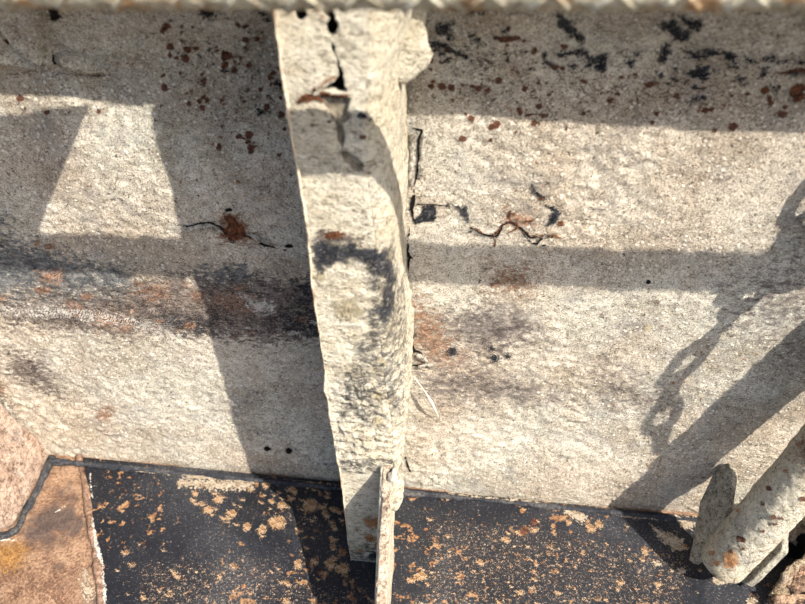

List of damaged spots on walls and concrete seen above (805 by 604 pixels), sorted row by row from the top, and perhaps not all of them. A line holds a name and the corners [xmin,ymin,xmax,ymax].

rust [159,17,287,154]
spalling [322,97,361,172]
rust [428,26,805,142]
rust [0,344,74,409]
leakage [0,207,152,316]
rust [92,405,118,421]
rust [0,255,321,356]
crack [177,207,294,251]
crack [413,331,437,369]
crack [407,128,560,273]